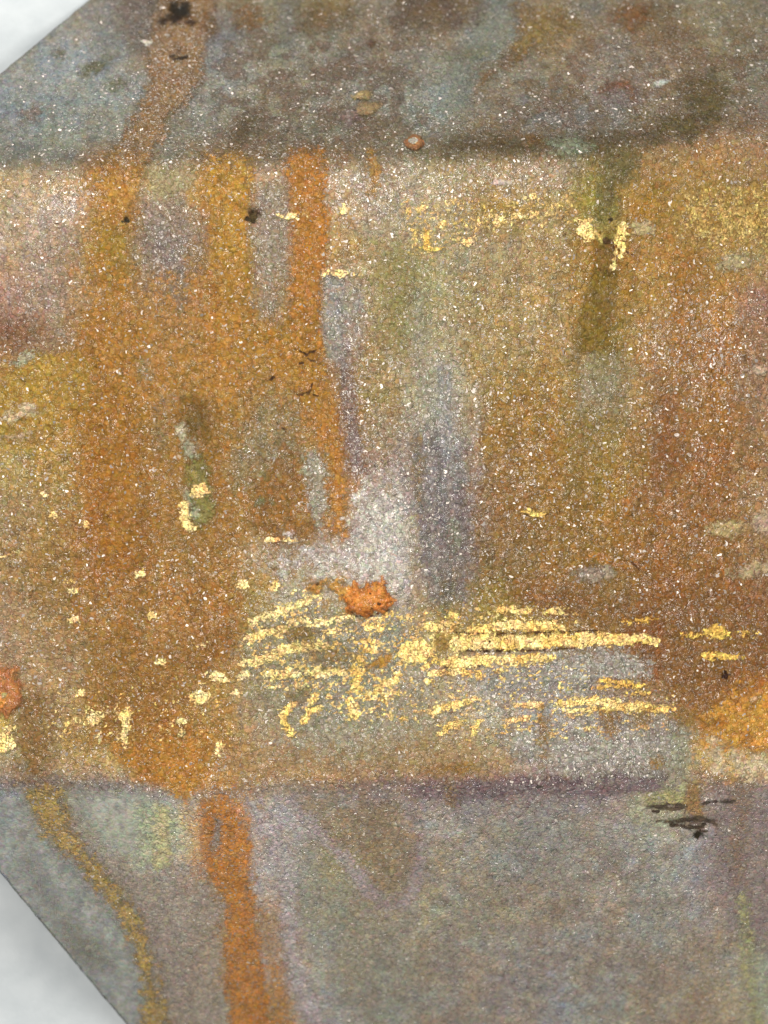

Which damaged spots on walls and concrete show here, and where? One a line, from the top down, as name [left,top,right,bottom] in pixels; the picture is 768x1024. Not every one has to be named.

corrosion [0,0,355,570]
water stain [439,68,733,354]
corrosion [661,251,704,375]
peeling [48,589,677,749]
corrosion [515,585,768,721]
corrosion [104,731,515,1024]